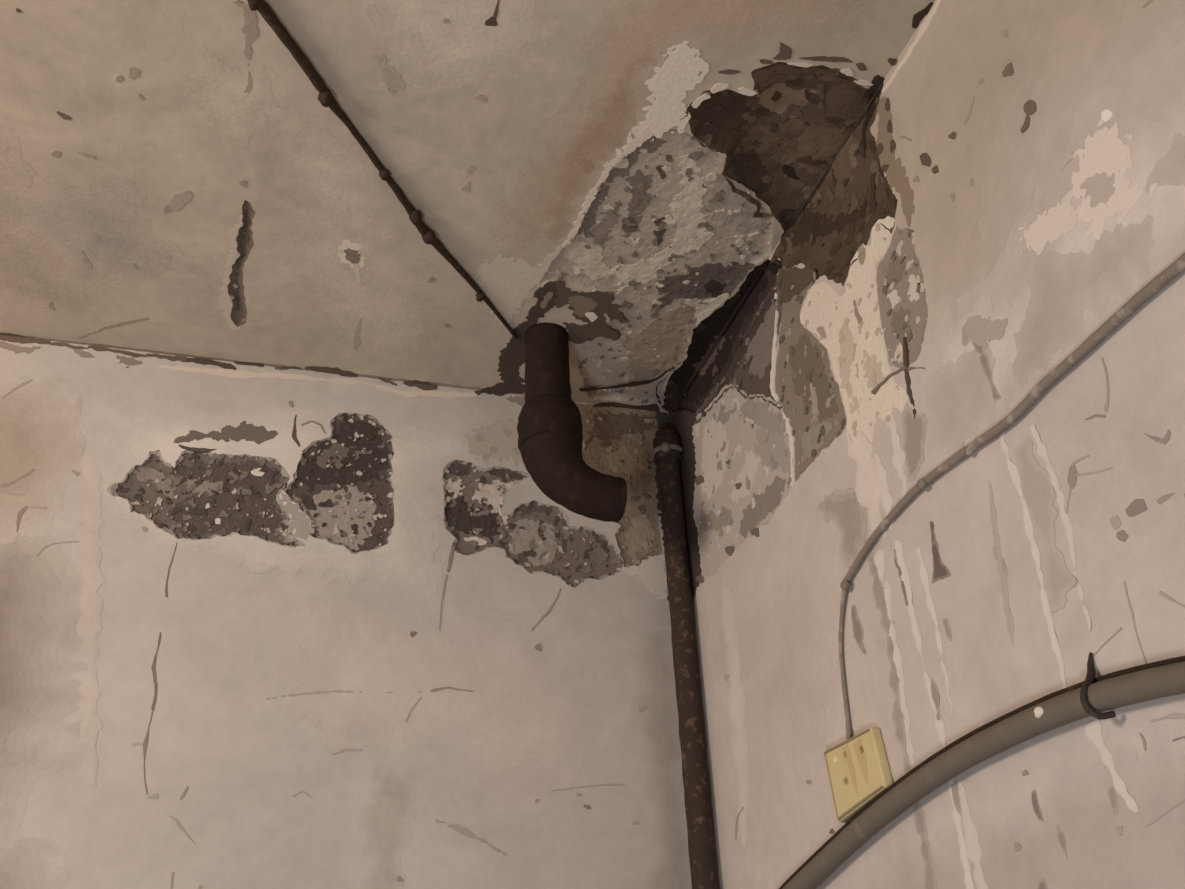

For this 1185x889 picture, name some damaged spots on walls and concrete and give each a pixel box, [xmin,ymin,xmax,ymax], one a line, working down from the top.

leakage [486,0,875,268]
peeling [920,153,939,174]
crack [25,336,313,371]
peeling [227,200,256,327]
spalling [111,413,395,554]
crack [355,373,483,390]
flaking render [442,41,928,588]
leakage [770,288,795,487]
leakage [816,215,1155,774]
leakage [704,526,839,884]